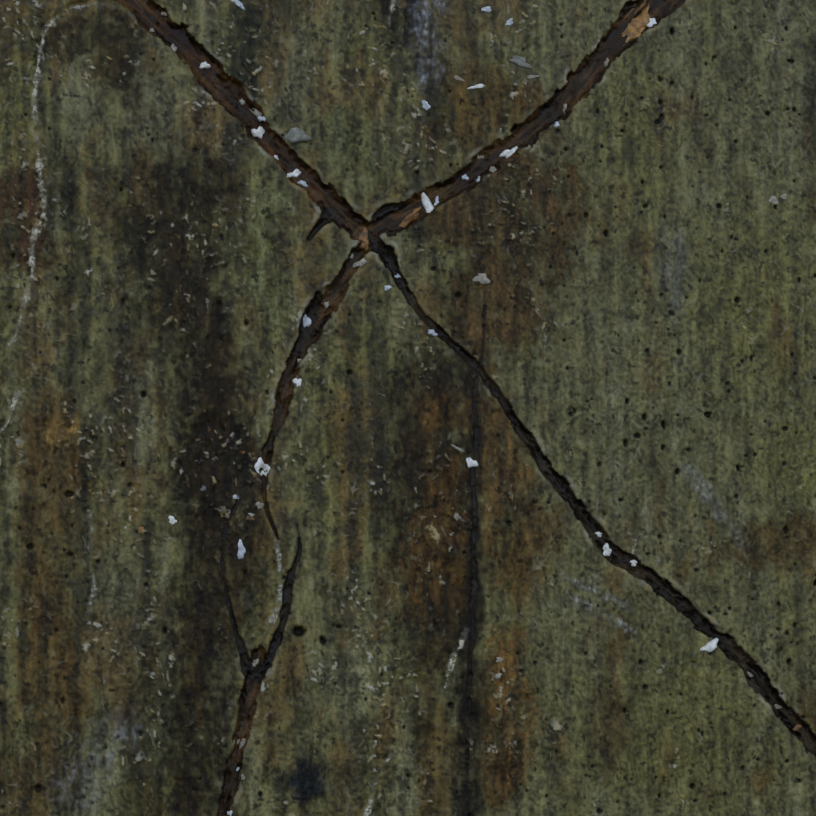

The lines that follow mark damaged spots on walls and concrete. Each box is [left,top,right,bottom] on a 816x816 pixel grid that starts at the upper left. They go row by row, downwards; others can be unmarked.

crack [32,20,55,113]
crack [24,153,46,301]
water stain [117,148,267,816]
crack [216,496,302,816]
water stain [281,758,326,804]
water stain [381,348,483,816]
crack [117,0,816,757]